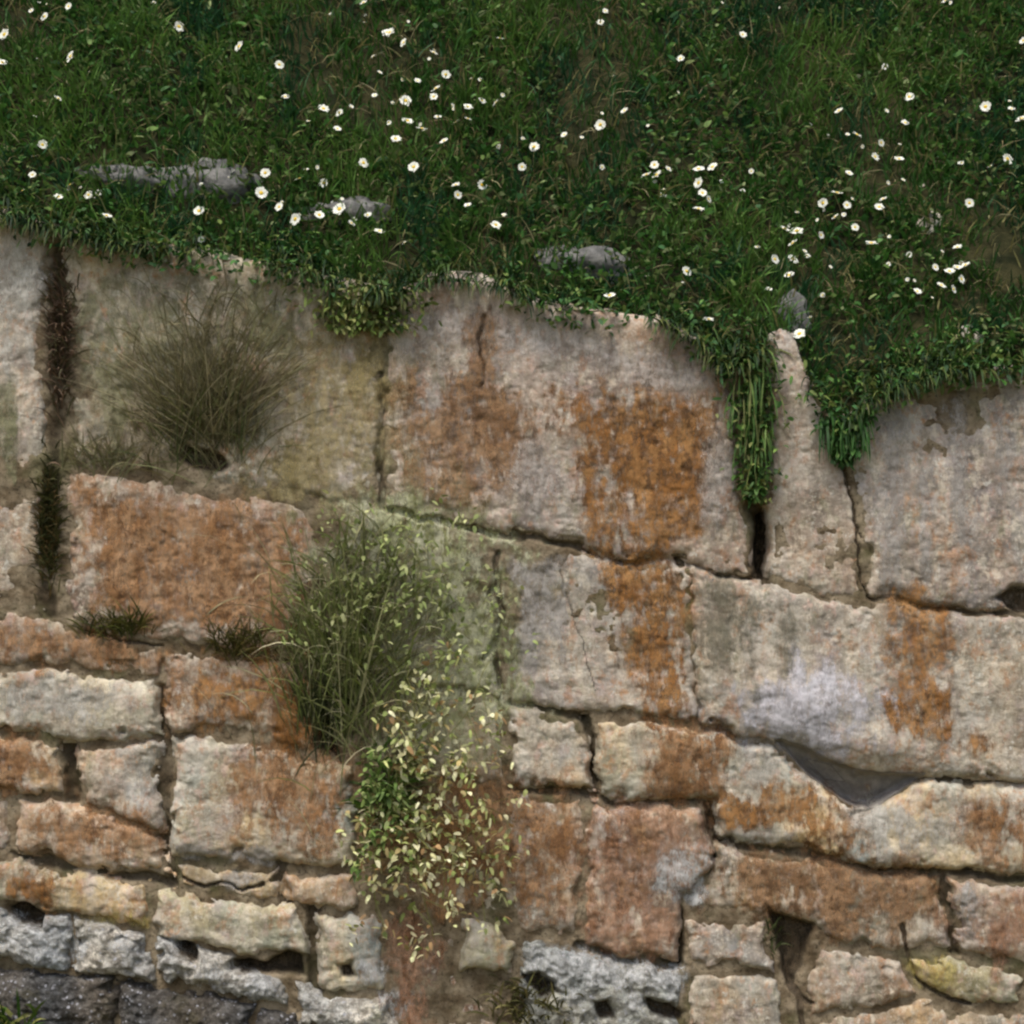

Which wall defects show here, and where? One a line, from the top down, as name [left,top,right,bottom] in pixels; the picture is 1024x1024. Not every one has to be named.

crack [559,569,596,691]
crack [183,876,265,892]